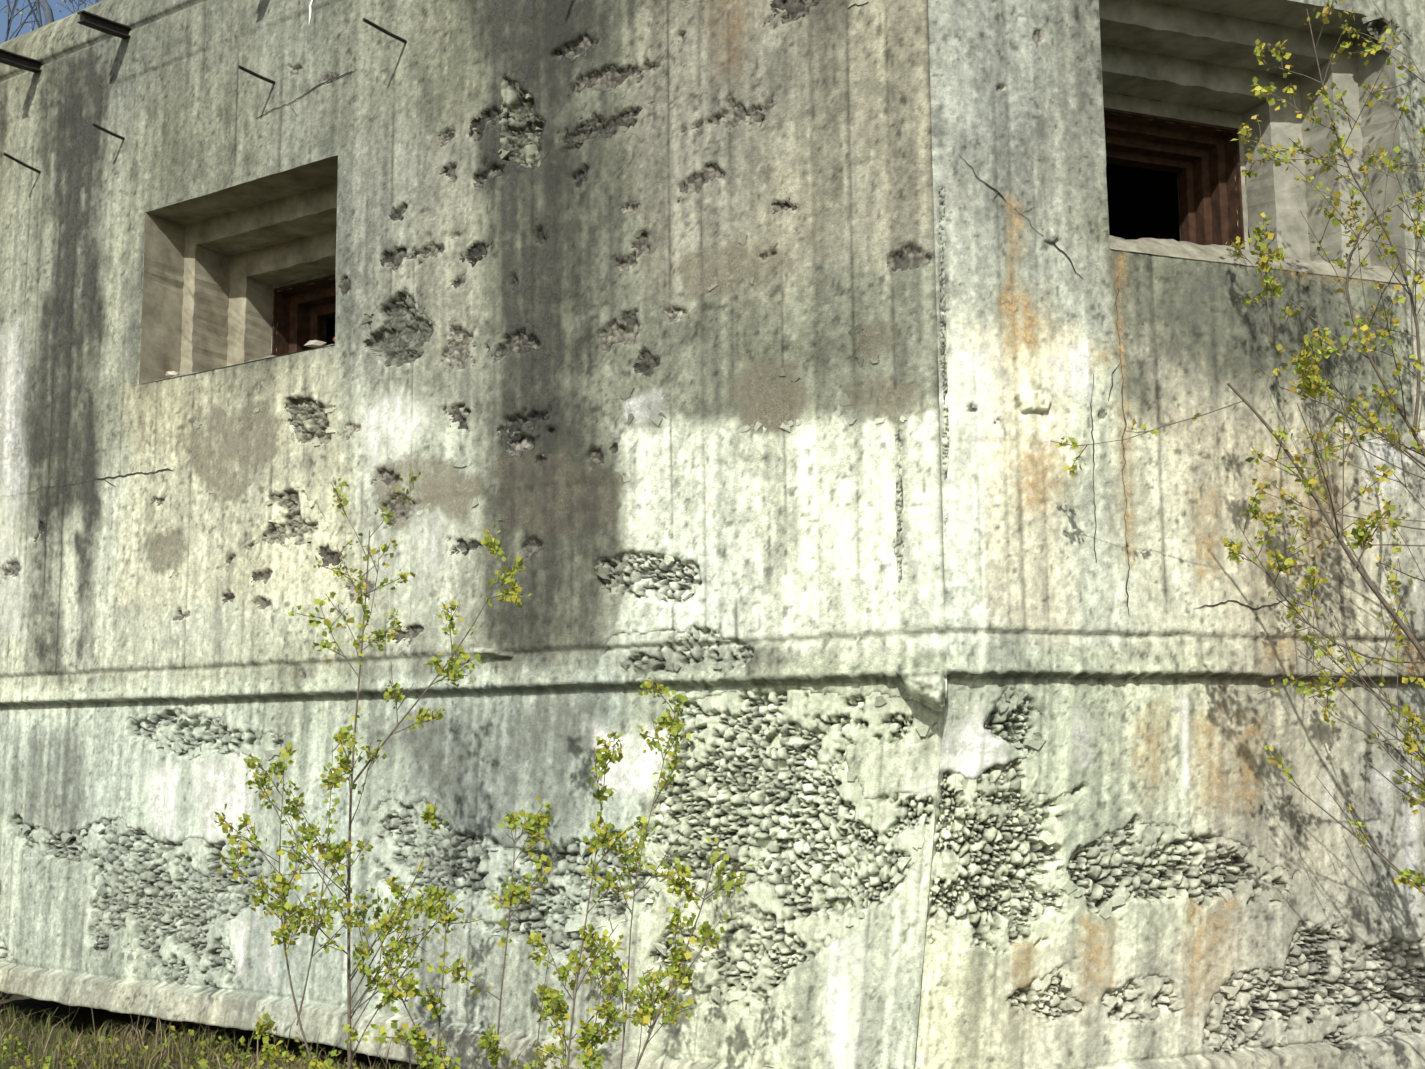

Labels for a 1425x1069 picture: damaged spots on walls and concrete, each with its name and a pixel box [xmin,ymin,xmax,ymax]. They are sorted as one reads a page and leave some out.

spalling [437,76,656,189]
crack [960,156,1083,279]
leakage [0,49,107,665]
leakage [471,0,633,651]
spalling [839,187,951,601]
crack [1090,260,1130,614]
spalling [594,550,702,605]
spalling [9,817,277,997]
spalling [126,709,286,761]
spalling [367,625,1301,1017]
spalling [1008,964,1186,1027]
spalling [1203,920,1425,1062]